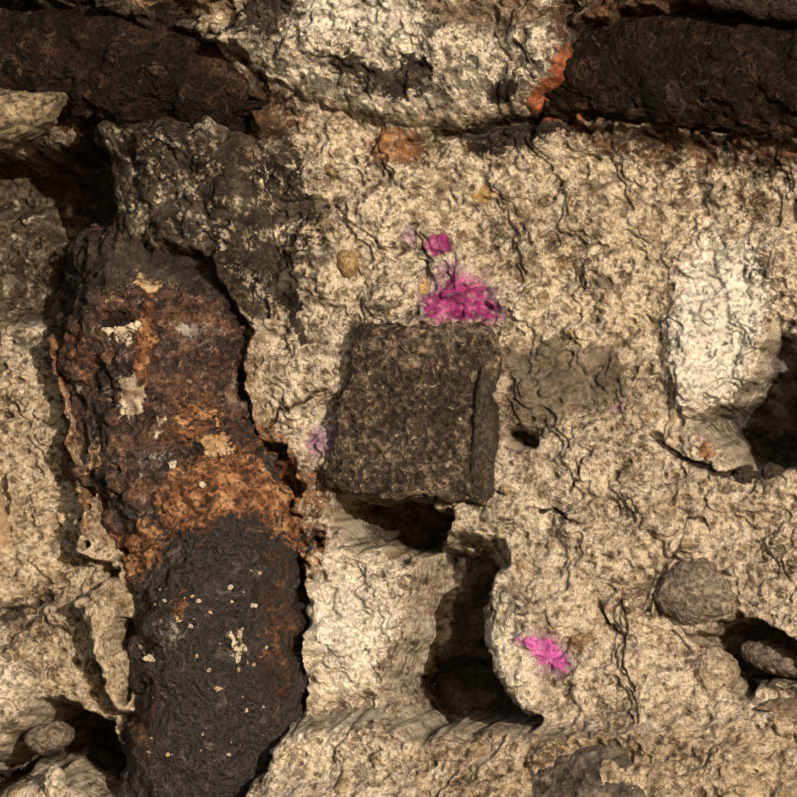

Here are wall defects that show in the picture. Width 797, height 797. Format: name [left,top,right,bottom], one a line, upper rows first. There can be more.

corrosion [525,0,797,211]
corrosion [46,213,346,714]
crack [651,434,735,478]
crack [598,600,635,691]